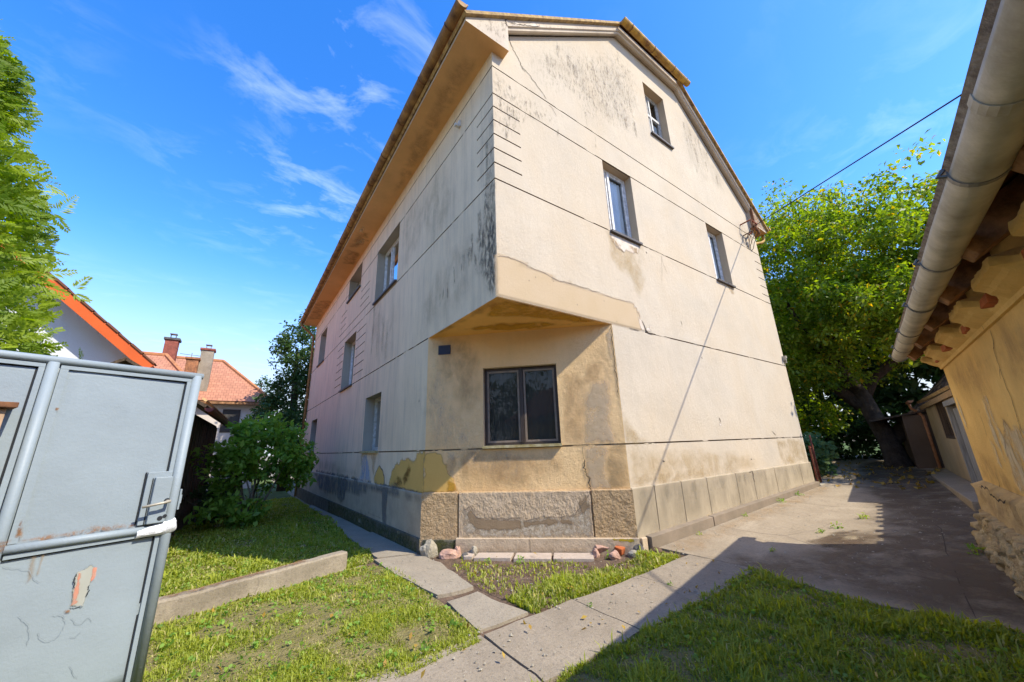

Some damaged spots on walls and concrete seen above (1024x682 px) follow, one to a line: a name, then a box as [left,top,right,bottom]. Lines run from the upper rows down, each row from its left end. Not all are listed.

flaking render [611,233,647,253]
leakage [315,461,417,524]
flaking render [464,495,592,538]
crack [582,447,594,528]